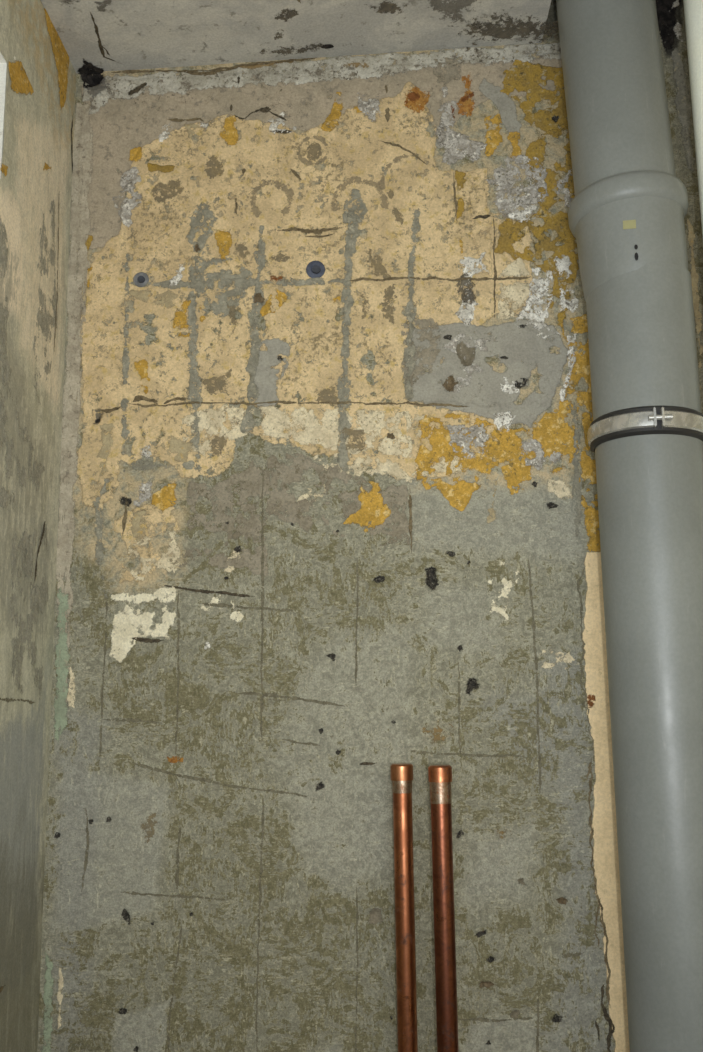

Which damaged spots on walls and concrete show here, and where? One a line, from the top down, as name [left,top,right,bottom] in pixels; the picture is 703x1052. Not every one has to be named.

rust [404,86,430,113]
rust [451,72,475,119]
flaking render [77,60,601,663]
crack [101,395,469,413]